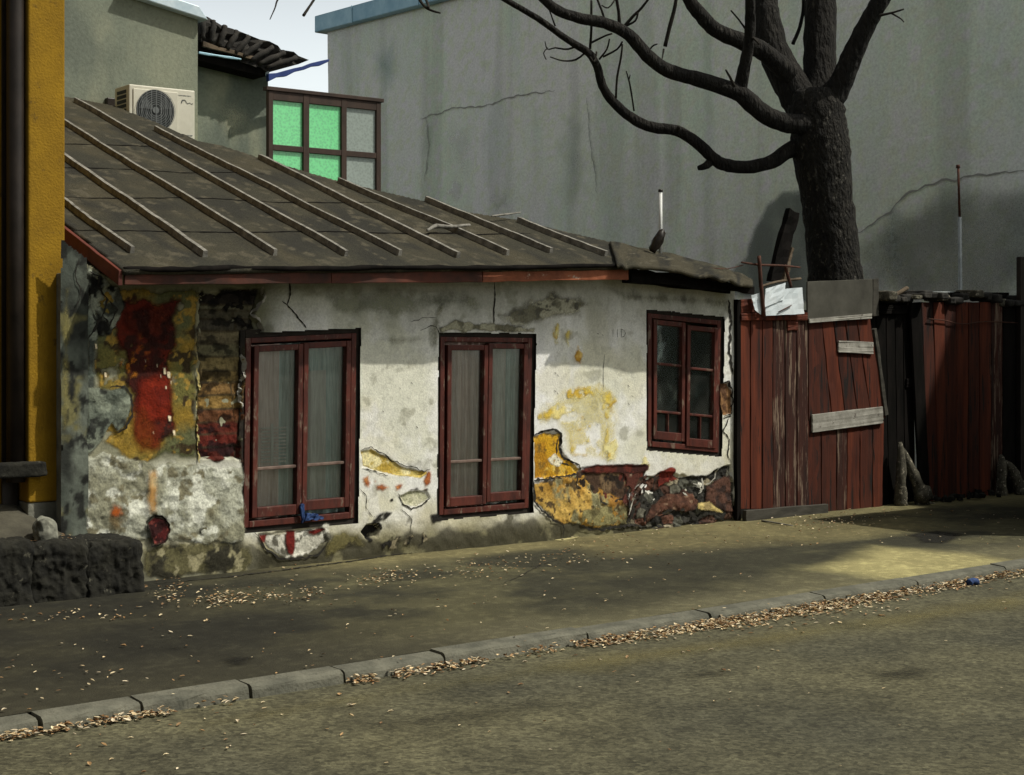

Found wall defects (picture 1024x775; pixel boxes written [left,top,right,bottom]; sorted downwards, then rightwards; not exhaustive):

crack [423,90,555,181]
crack [858,170,1023,233]
crack [282,284,306,328]
peeling [86,266,258,547]
peeling [361,446,431,510]
peeling [533,428,646,505]